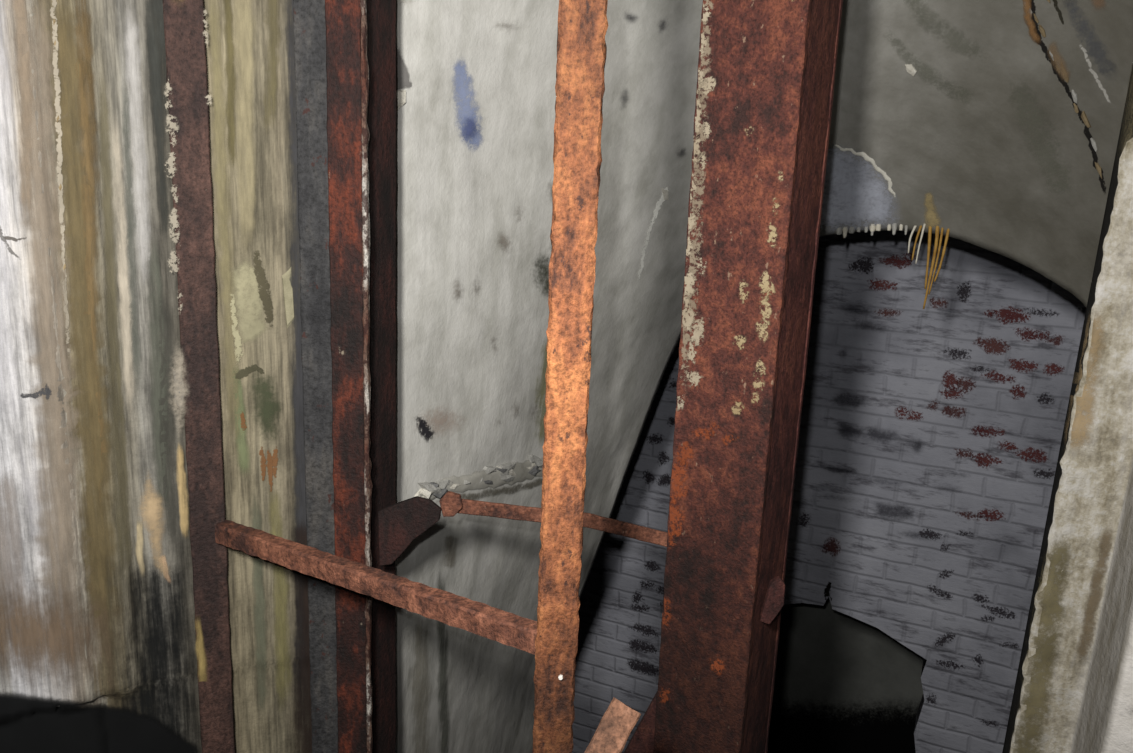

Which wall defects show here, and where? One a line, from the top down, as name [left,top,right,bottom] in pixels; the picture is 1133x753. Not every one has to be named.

crack [1023,0,1110,192]
spalling [820,145,895,229]
crack [0,229,26,258]
water stain [536,260,549,293]
peeling [642,0,716,486]
peeling [739,272,775,341]
water stain [0,0,197,753]
rust [177,447,188,533]
spalling [414,454,543,500]
rust [668,424,733,546]
water stain [1078,532,1111,656]
rust [196,623,206,682]